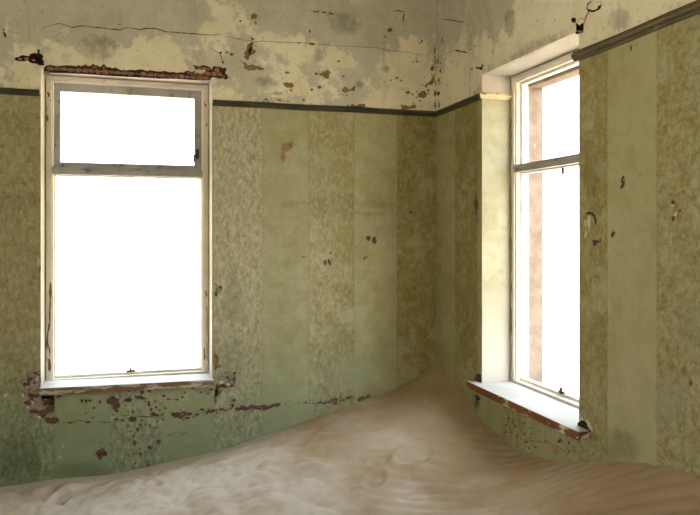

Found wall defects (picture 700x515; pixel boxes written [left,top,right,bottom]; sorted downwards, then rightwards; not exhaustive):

flaking render [14,46,229,80]
crack [43,23,422,63]
flaking render [239,38,269,71]
flaking render [398,38,445,110]
spalling [584,212,601,246]
spalling [20,371,62,424]
spalling [81,353,289,464]
spalling [299,394,371,405]
spalling [577,408,593,436]